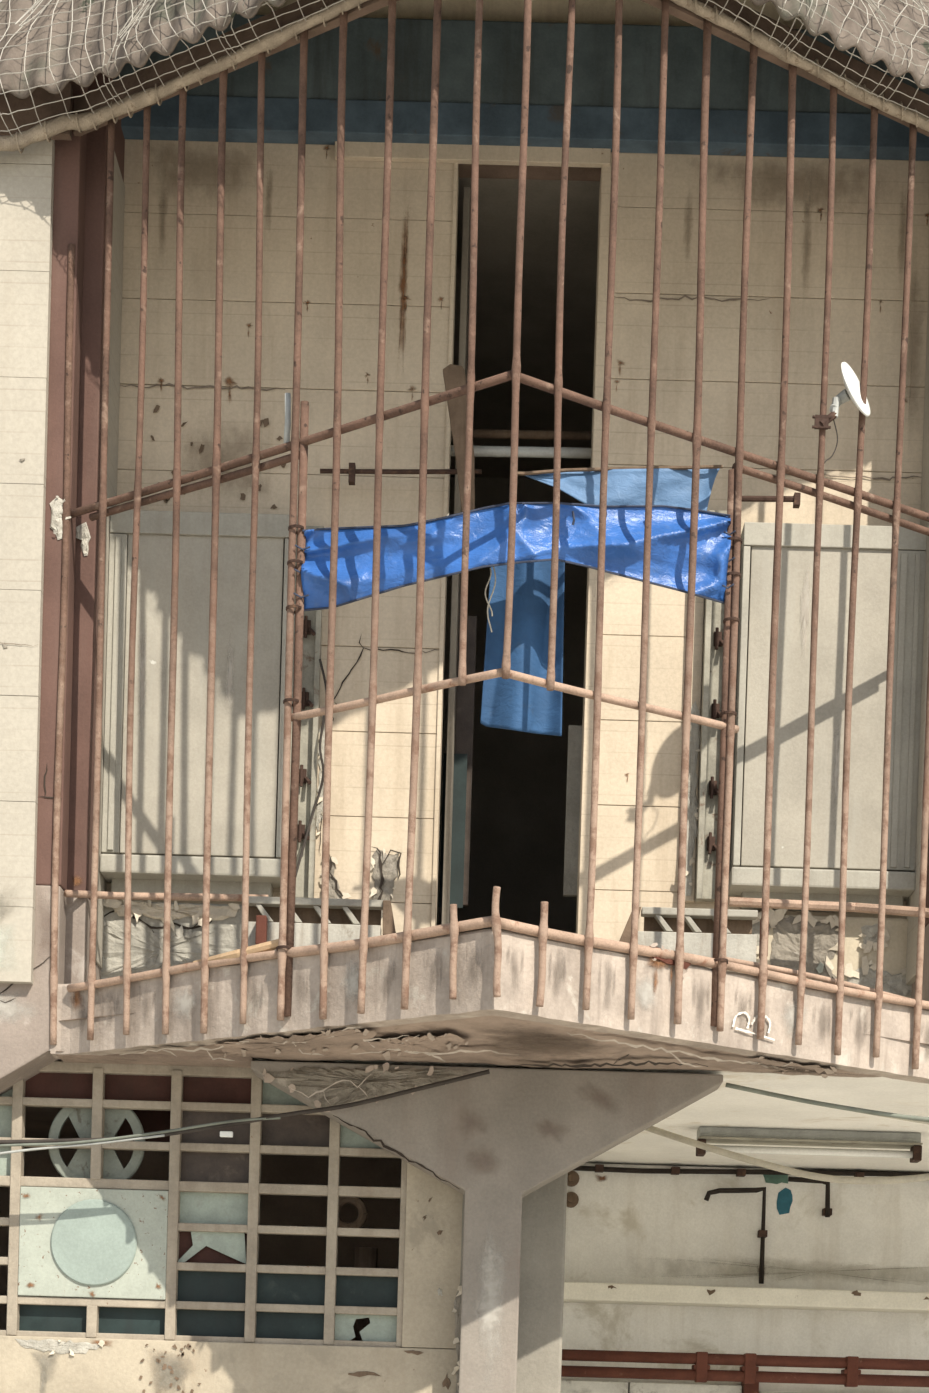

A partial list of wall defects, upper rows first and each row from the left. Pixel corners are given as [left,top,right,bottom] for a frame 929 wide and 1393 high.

corrosion [399,231,410,345]
peeling [319,856,351,899]
peeling [369,848,400,918]
crack [0,957,49,1003]
spalling [101,899,240,977]
spalling [752,908,912,997]
spalling [262,1037,469,1112]